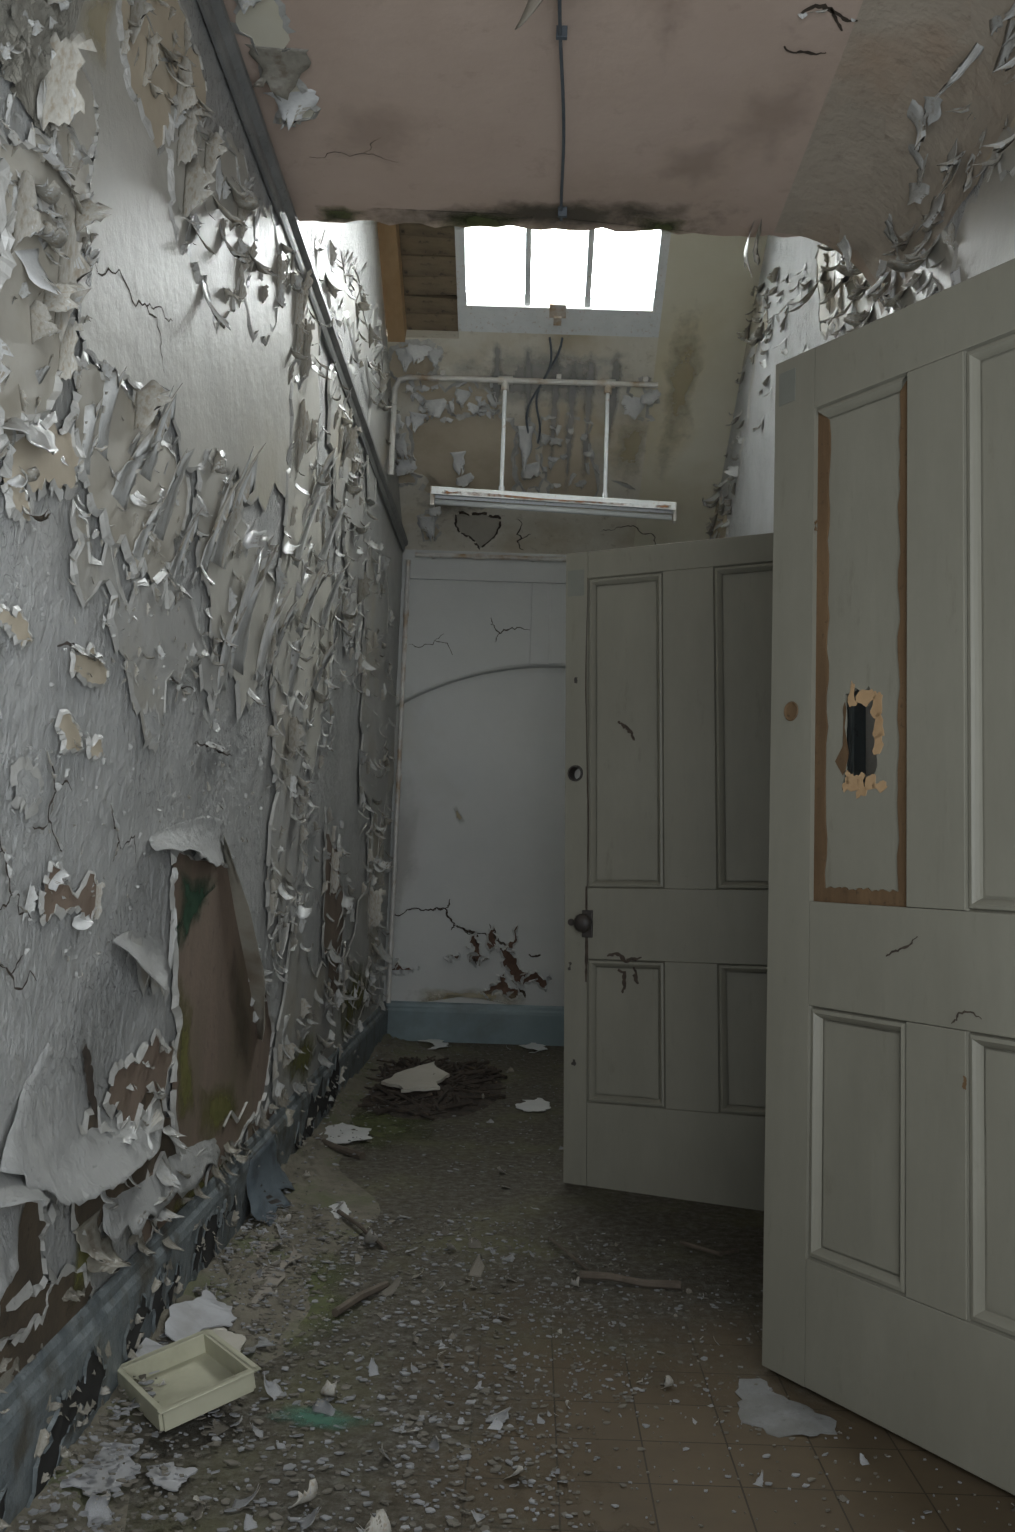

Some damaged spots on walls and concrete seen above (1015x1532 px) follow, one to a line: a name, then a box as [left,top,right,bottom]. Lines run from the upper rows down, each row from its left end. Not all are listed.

crack [784,4,858,55]
peeling [702,0,1015,539]
peeling [621,376,661,422]
peeling [0,0,636,1508]
crack [395,899,489,938]
spalling [607,952,642,993]
peeling [0,1481,11,1531]